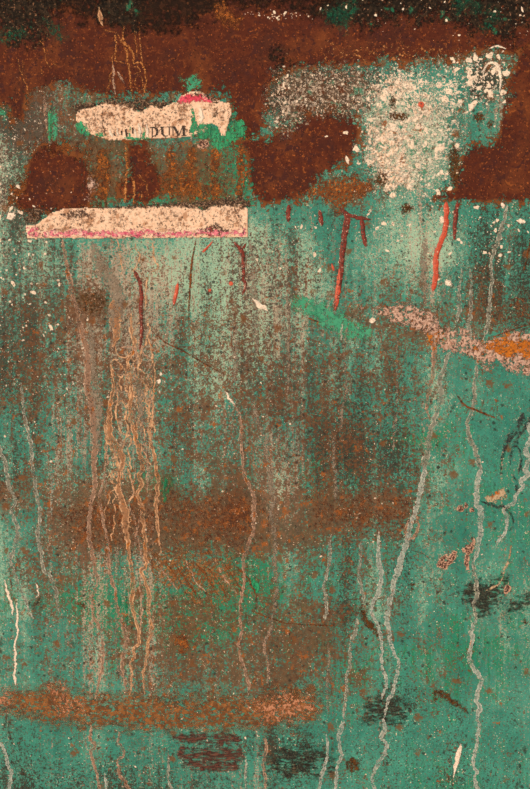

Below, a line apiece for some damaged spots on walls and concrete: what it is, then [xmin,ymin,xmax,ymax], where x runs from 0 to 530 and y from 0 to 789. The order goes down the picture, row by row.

corrosion [0,0,530,219]
water stain [122,145,148,203]
water stain [38,210,162,699]
corrosion [53,484,277,607]
water stain [88,729,108,789]
corrosion [0,682,325,736]